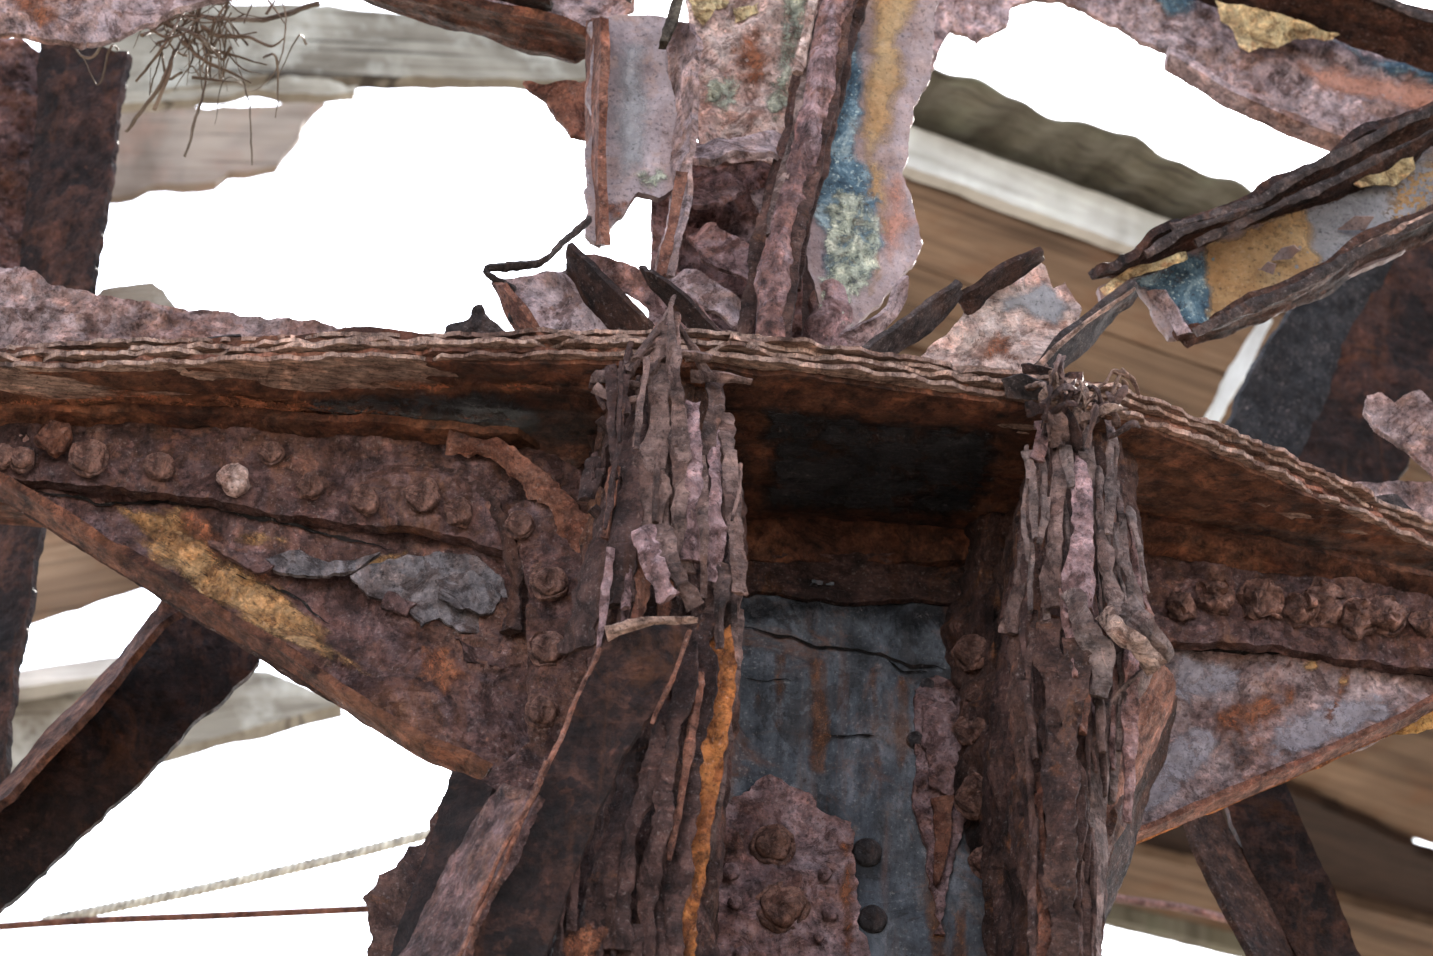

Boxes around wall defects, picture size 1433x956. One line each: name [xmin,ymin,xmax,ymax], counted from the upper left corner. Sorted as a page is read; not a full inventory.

peeling [814,33,885,326]
peeling [1354,157,1415,188]
peeling [1135,209,1321,324]
corrosion [0,389,442,420]
corrosion [371,380,558,394]
corrosion [122,508,517,691]
corrosion [547,169,765,956]
crack [744,627,945,673]
corrosion [970,334,1174,956]
crack [823,731,874,739]
corrosion [1217,687,1294,732]
corrosion [911,675,966,937]